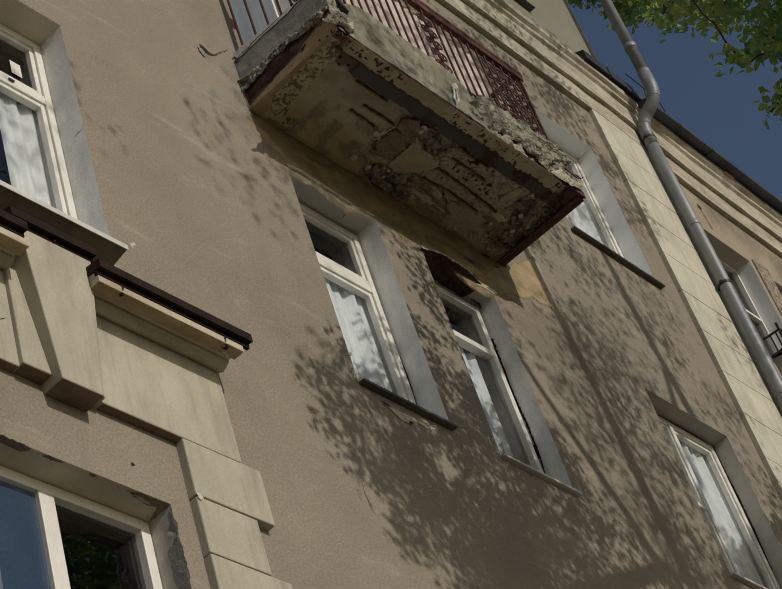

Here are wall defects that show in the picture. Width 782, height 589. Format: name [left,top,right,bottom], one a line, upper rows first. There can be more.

spalling [237,10,355,88]
peeling [387,125,488,179]
spalling [469,95,583,188]
spalling [481,193,554,258]
peeling [420,245,555,310]
flaking render [382,401,435,430]
peeling [0,434,67,464]
peeling [126,490,192,589]